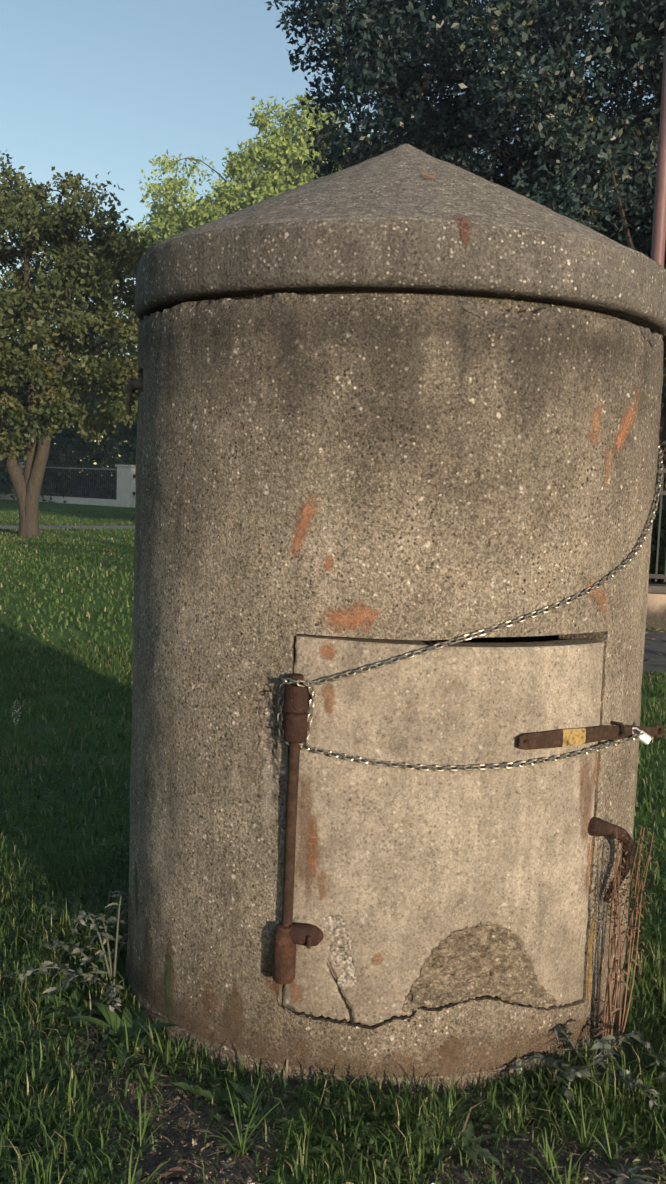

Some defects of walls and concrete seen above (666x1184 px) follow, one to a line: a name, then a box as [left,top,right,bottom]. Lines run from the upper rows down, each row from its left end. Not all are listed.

rust [606,389,640,486]
rust [323,685,335,713]
rust [308,821,326,898]
spalling [321,915,357,987]
crack [273,962,530,1030]
spalling [402,923,557,1012]